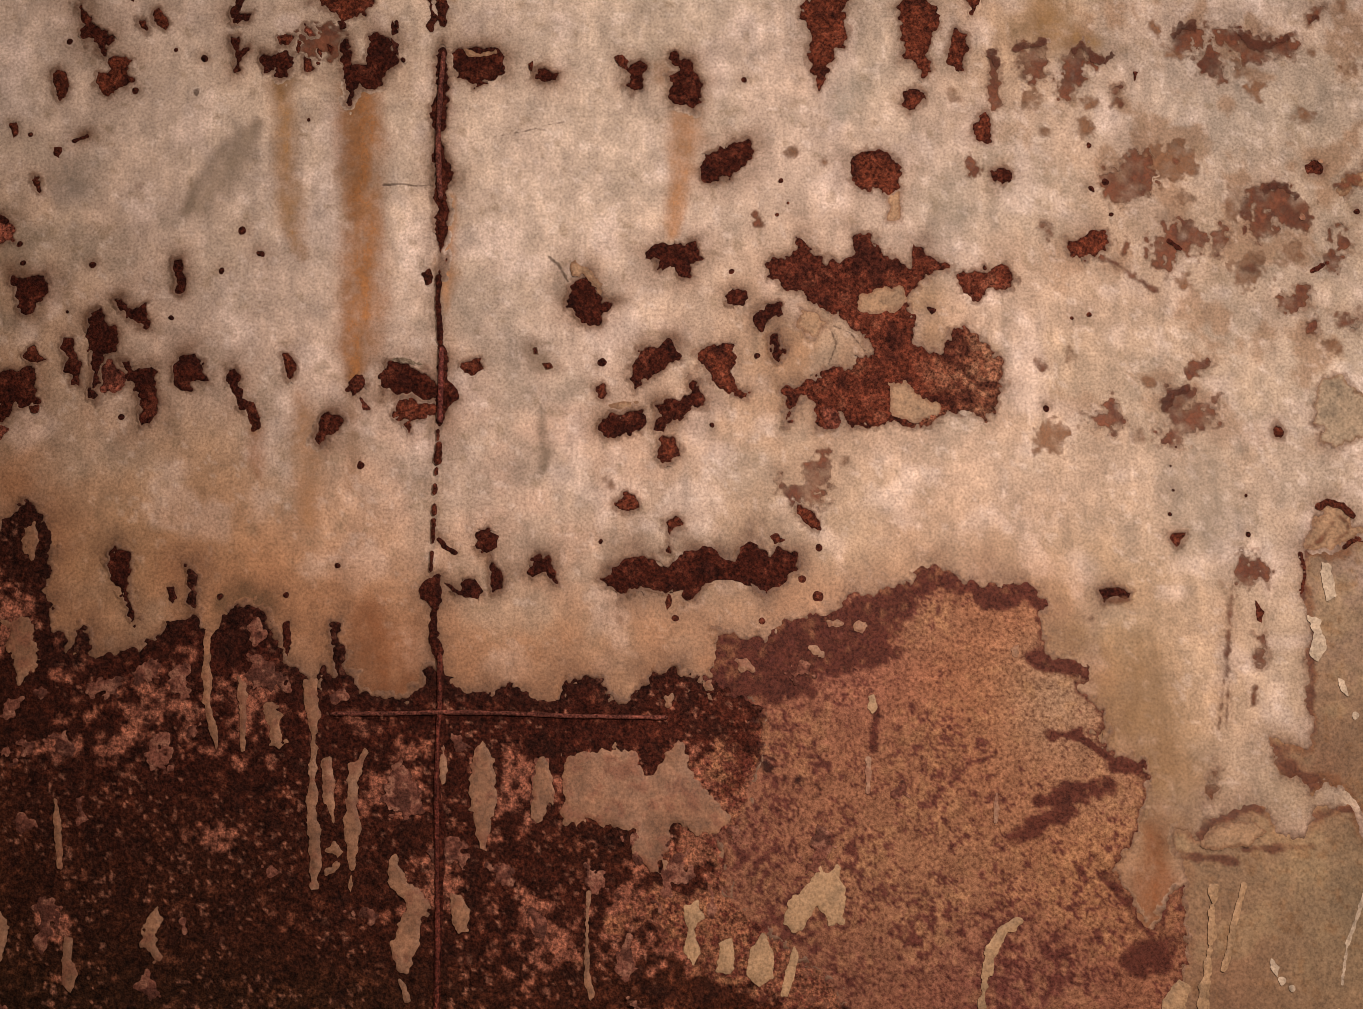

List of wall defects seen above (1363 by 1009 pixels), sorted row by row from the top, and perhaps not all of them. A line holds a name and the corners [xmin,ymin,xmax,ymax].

peeling [53,134,89,158]
peeling [697,134,760,188]
peeling [0,210,56,320]
peeling [552,259,620,334]
peeling [645,235,707,285]
peeling [722,143,1022,436]
peeling [0,253,265,460]
peeling [276,349,303,385]
peeling [306,357,438,452]
peeling [456,349,490,381]
peeling [588,335,755,469]
peeling [0,448,1363,1009]